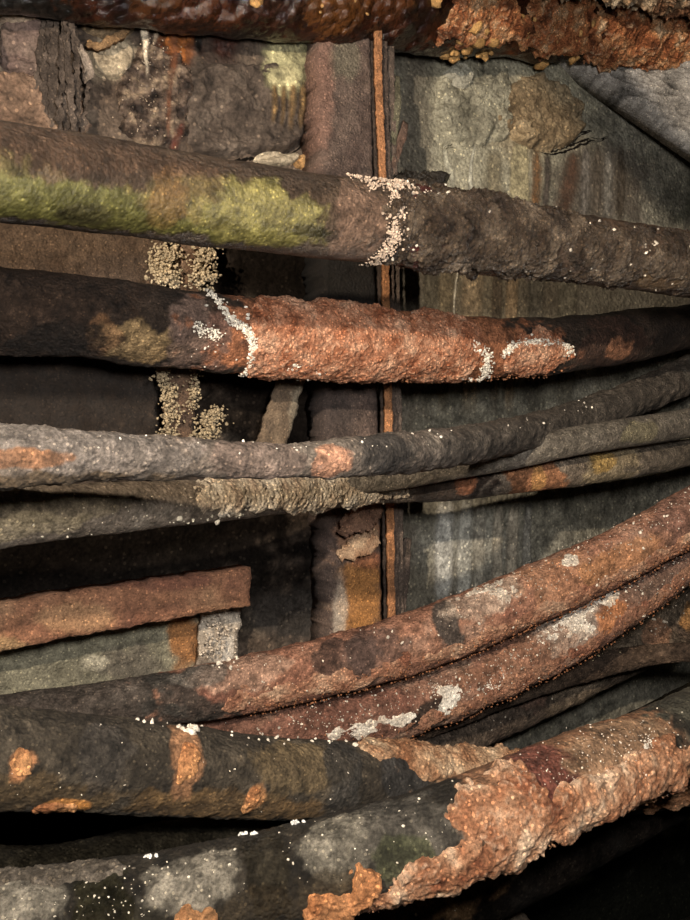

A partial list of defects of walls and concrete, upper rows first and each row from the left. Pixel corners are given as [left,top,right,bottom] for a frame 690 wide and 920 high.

corrosion [433,0,690,73]
efflorescence [345,172,419,267]
corrosion [239,31,690,433]
efflorescence [144,241,258,377]
efflorescence [193,477,410,518]
corrosion [336,503,404,619]
corrosion [214,532,690,713]
corrosion [10,747,32,776]
corrosion [32,802,78,814]
corrosion [176,742,202,785]
corrosion [241,786,261,814]
corrosion [302,565,690,920]